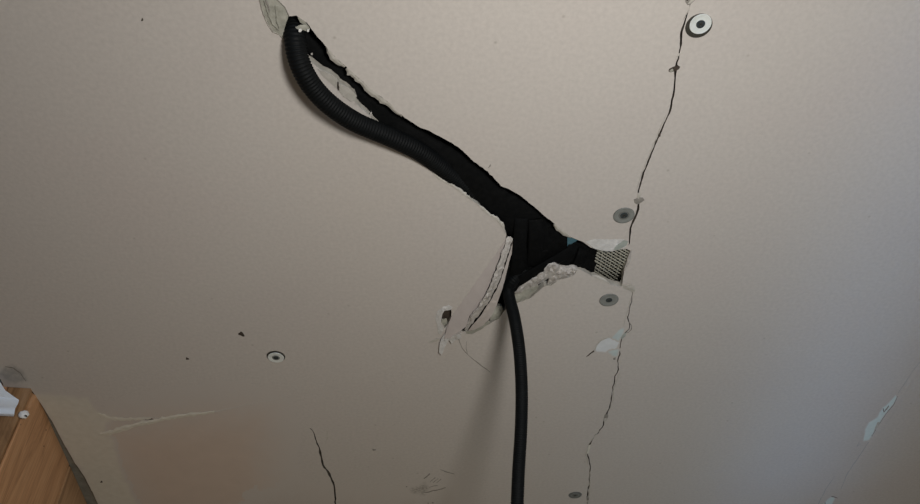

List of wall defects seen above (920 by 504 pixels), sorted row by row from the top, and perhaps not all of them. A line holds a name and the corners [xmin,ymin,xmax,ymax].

crack [629,0,695,244]
spalling [515,262,578,294]
peeling [586,239,628,251]
crack [585,292,633,504]
crack [310,428,336,504]